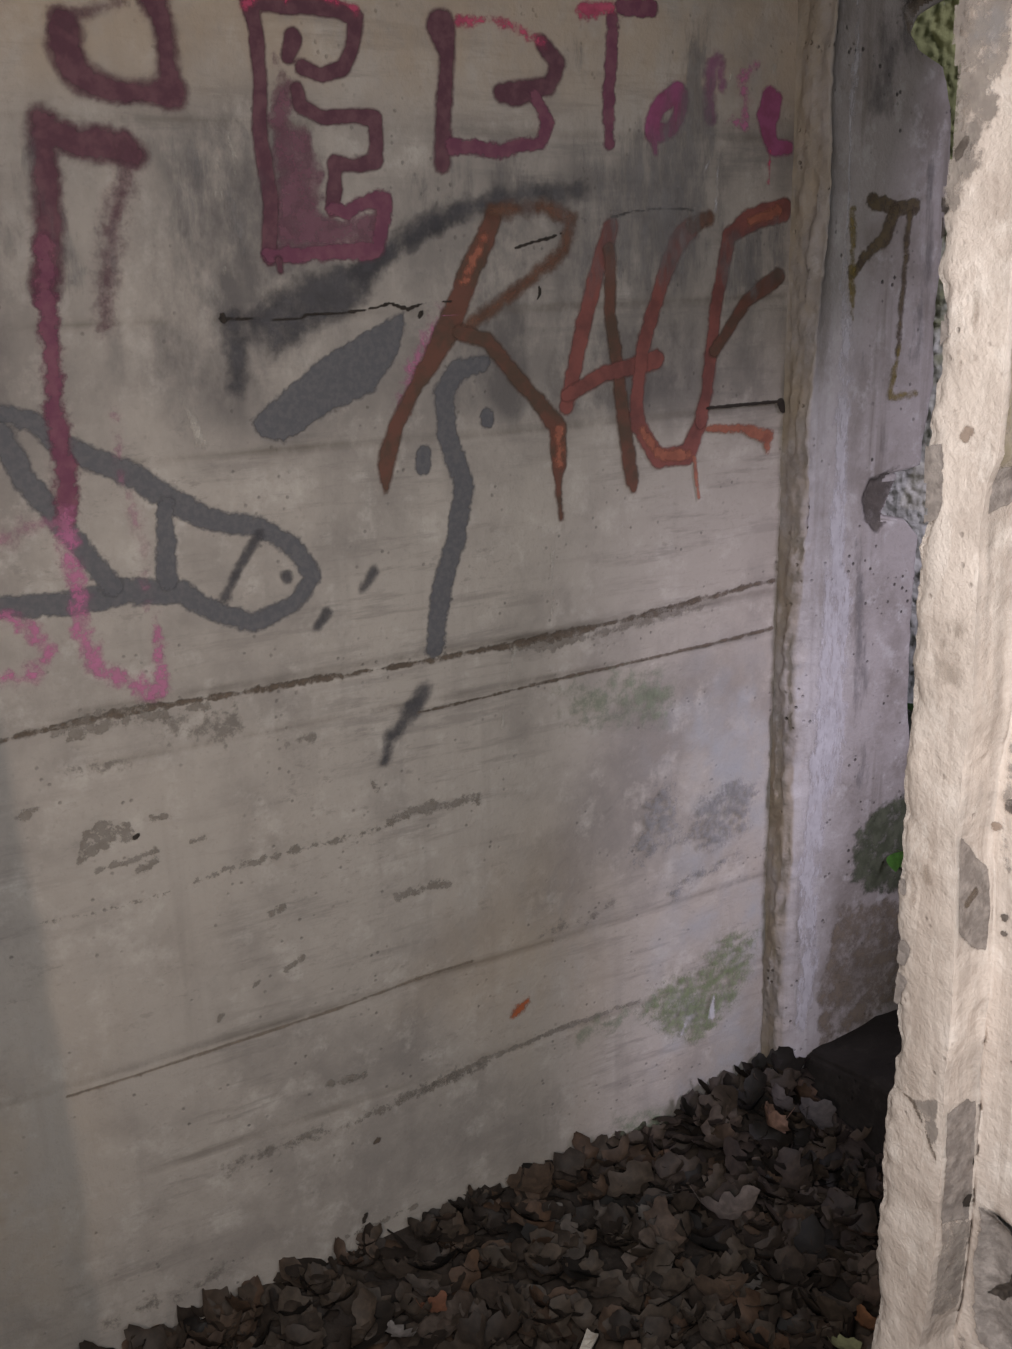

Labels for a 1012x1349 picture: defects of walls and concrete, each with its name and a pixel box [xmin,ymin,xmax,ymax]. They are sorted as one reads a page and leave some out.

spalling [941,0,1012,238]
spalling [940,314,949,345]
spalling [960,426,974,443]
spalling [924,444,944,523]
spalling [988,467,1012,514]
spalling [991,745,1012,831]
spalling [894,940,910,1004]
spalling [903,1093,1012,1349]